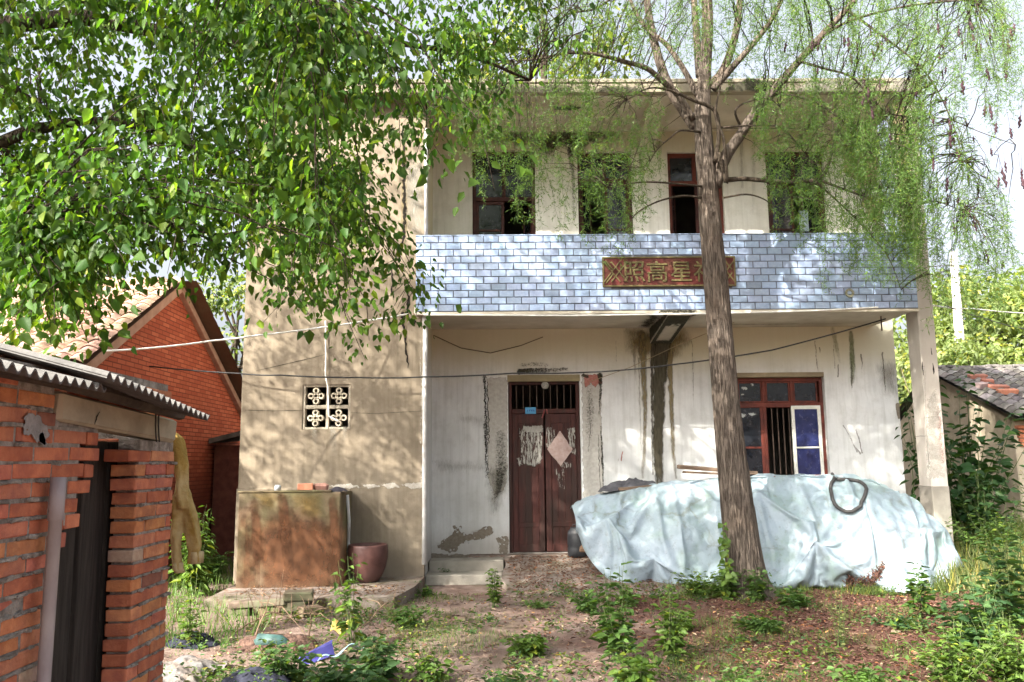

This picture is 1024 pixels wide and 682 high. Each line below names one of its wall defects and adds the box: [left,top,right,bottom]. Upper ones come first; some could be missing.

leakage [630,310,697,483]
flaking render [431,525,509,558]